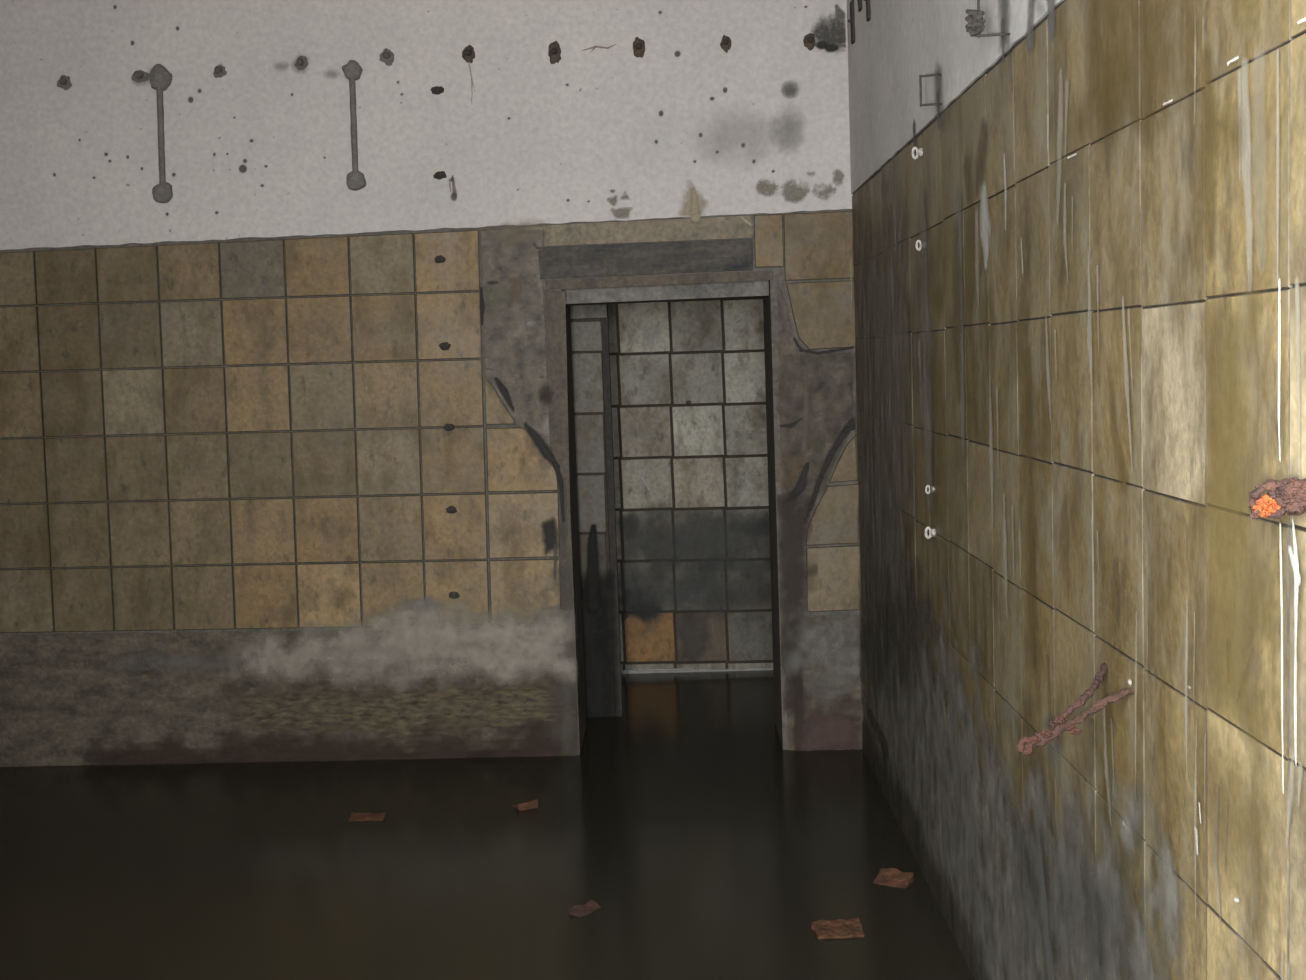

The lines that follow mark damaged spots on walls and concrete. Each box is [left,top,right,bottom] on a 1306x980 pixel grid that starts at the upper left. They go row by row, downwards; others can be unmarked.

crack [478,287,486,325]
crack [793,338,853,354]
crack [780,418,802,427]
crack [495,378,565,522]
crack [787,418,855,517]
corrosion [1250,494,1282,520]